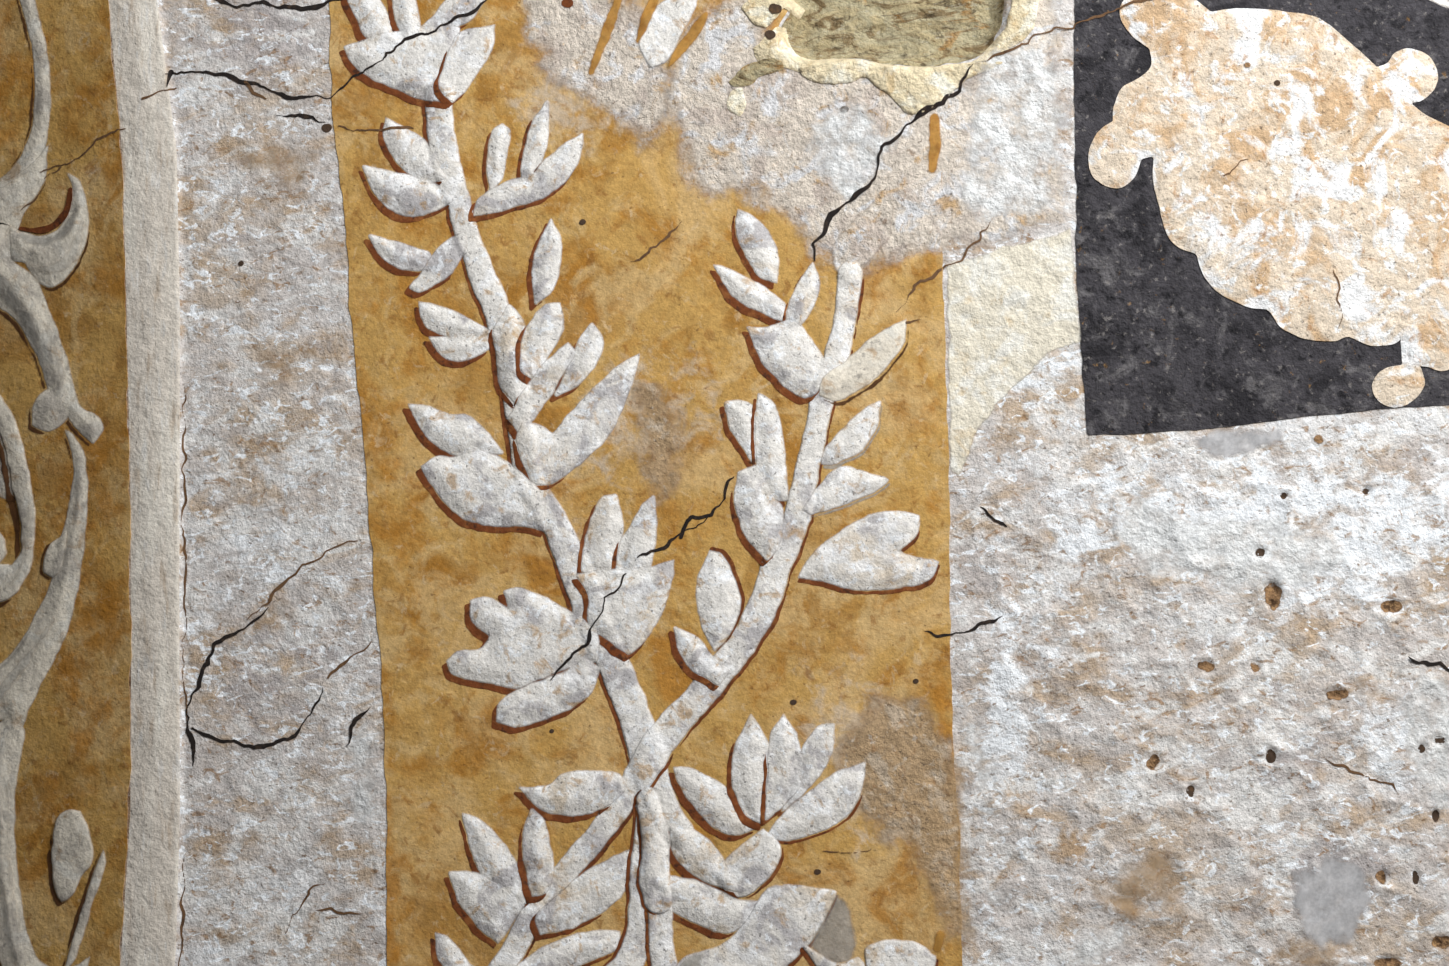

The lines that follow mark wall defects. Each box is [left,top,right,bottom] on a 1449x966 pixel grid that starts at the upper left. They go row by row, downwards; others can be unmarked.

crack [0,0,487,224]
peeling [524,0,1070,270]
crack [811,0,1147,261]
crack [181,395,371,765]
crack [550,477,734,680]